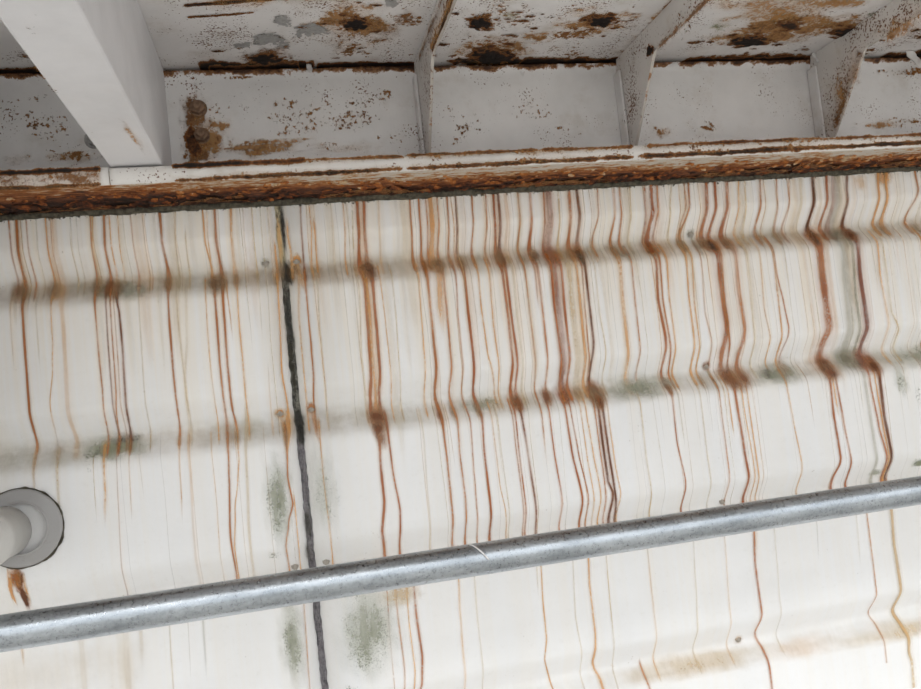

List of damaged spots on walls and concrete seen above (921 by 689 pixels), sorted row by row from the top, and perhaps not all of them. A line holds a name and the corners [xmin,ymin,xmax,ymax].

corrosion [171,0,921,182]
corrosion [8,220,39,459]
corrosion [90,215,132,467]
corrosion [158,213,181,446]
corrosion [202,209,243,579]
corrosion [254,222,320,571]
corrosion [345,201,401,557]
corrosion [409,193,537,547]
corrosion [642,185,678,391]
corrosion [677,182,761,503]
corrosion [805,176,893,489]
corrosion [8,569,29,607]